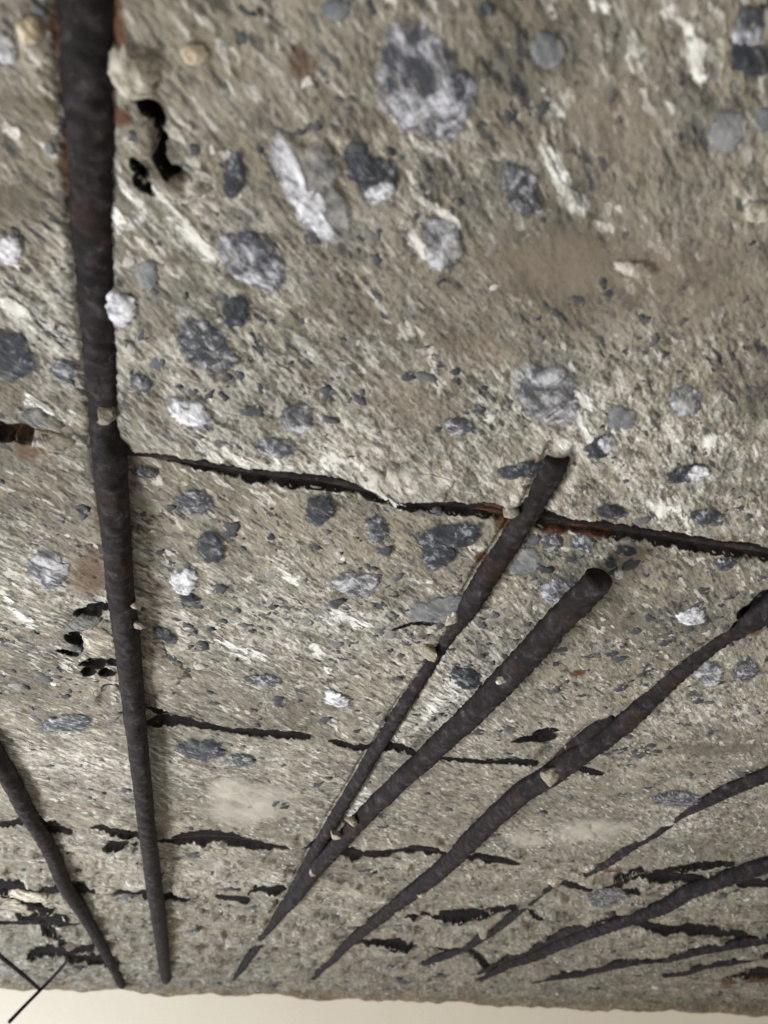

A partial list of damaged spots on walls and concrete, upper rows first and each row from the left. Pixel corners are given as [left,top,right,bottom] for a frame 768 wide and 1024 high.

corrosion [112,0,125,51]
spalling [0,407,75,452]
spalling [55,0,377,984]
crack [135,453,504,520]
corrosion [475,503,510,530]
corrosion [541,522,609,538]
corrosion [69,558,104,598]
crack [145,706,538,767]
spalling [232,455,768,984]
spalling [0,741,126,989]
crack [0,817,520,866]
crack [0,879,287,968]